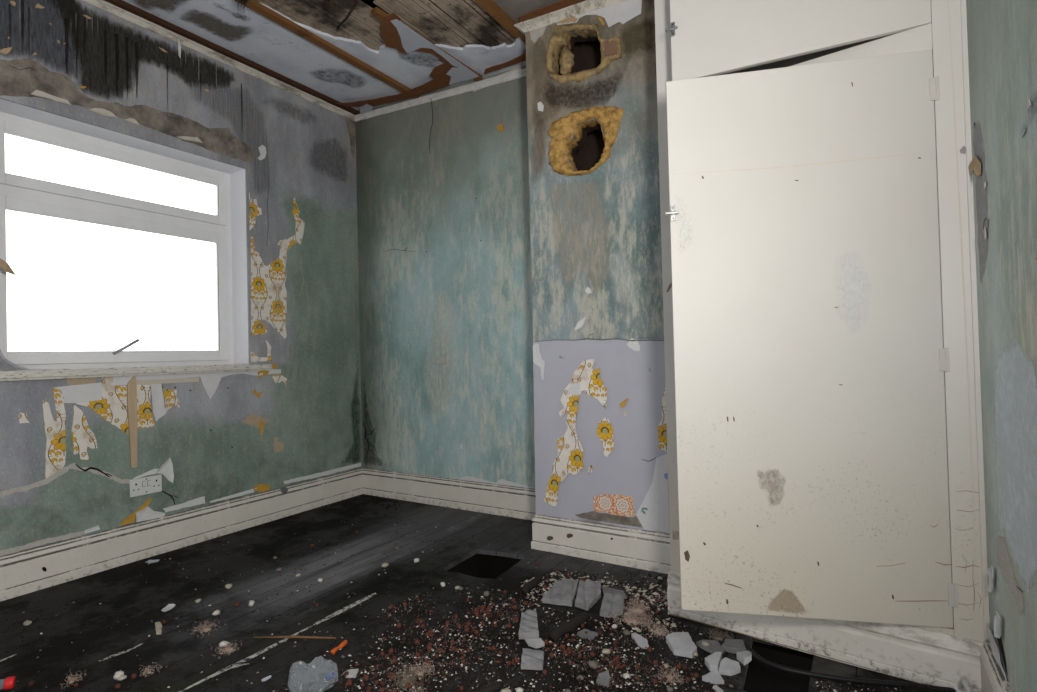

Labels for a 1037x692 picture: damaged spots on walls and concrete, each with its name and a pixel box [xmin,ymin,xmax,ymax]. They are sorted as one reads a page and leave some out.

flaking render [0,37,266,163]
leakage [54,0,256,138]
spalling [530,23,622,83]
leakage [533,46,619,174]
spalling [547,106,624,177]
leakage [622,21,655,53]
flaking render [960,125,989,279]
peeling [0,463,131,497]
peeling [156,458,174,483]
peeling [119,488,257,526]
flaking render [409,317,670,540]
flaking render [994,344,1037,592]